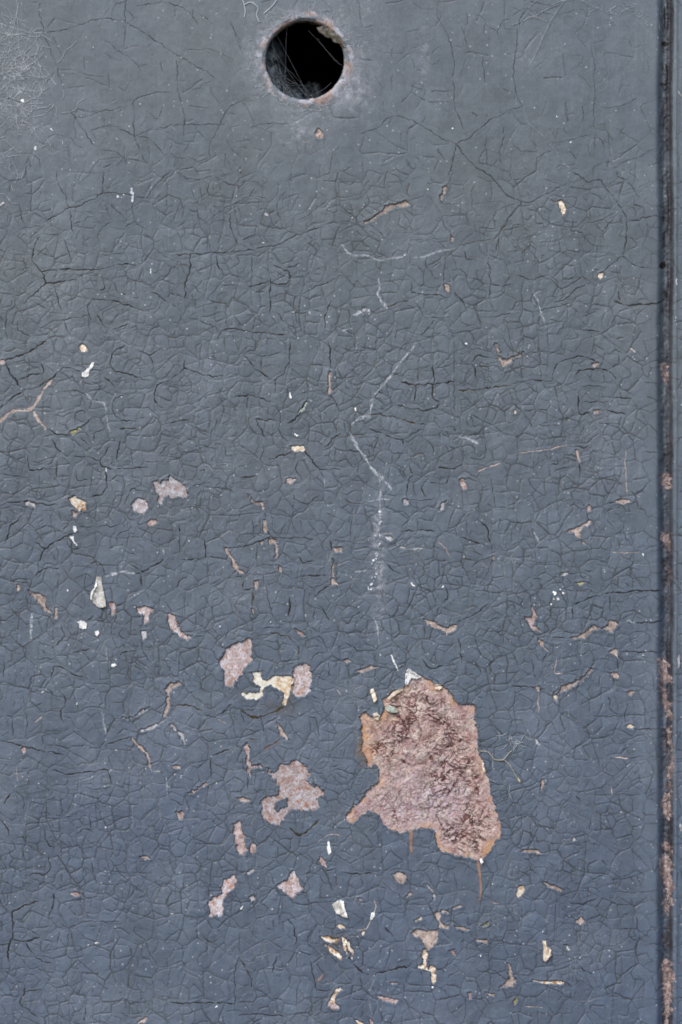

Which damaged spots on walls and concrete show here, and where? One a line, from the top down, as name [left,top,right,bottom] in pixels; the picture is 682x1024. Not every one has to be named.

crack [0,0,665,776]
peeling [132,475,189,526]
peeling [219,638,312,705]
crack [0,627,130,1017]
peeling [237,743,324,825]
crack [290,819,339,843]
rust [346,669,501,900]
peeling [208,869,254,917]
crack [170,919,367,1017]
peeling [277,870,304,898]
crack [354,963,411,991]
peeling [412,884,488,983]